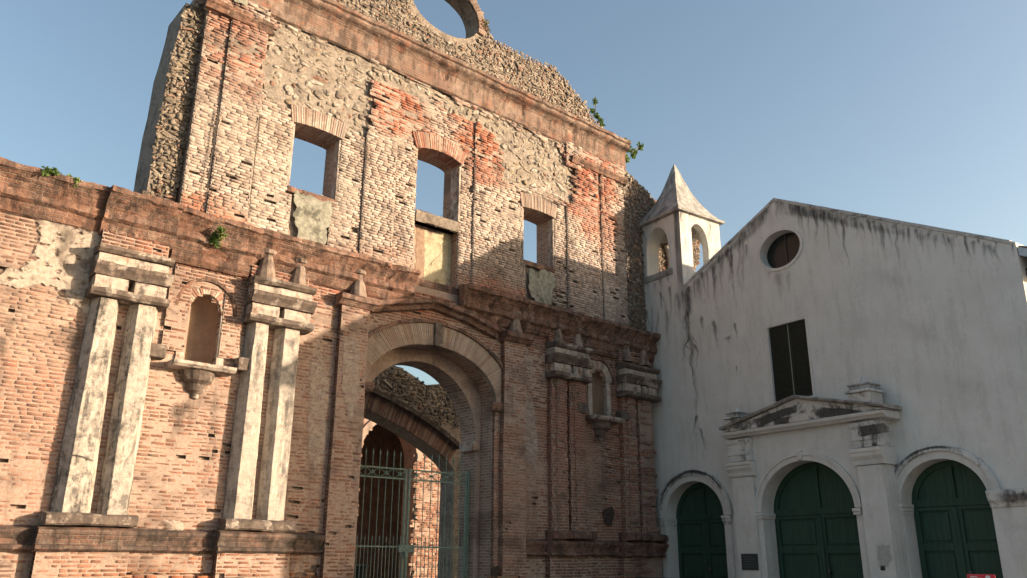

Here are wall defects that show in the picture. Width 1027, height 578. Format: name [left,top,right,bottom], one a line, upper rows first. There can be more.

flaking render [0,219,102,318]